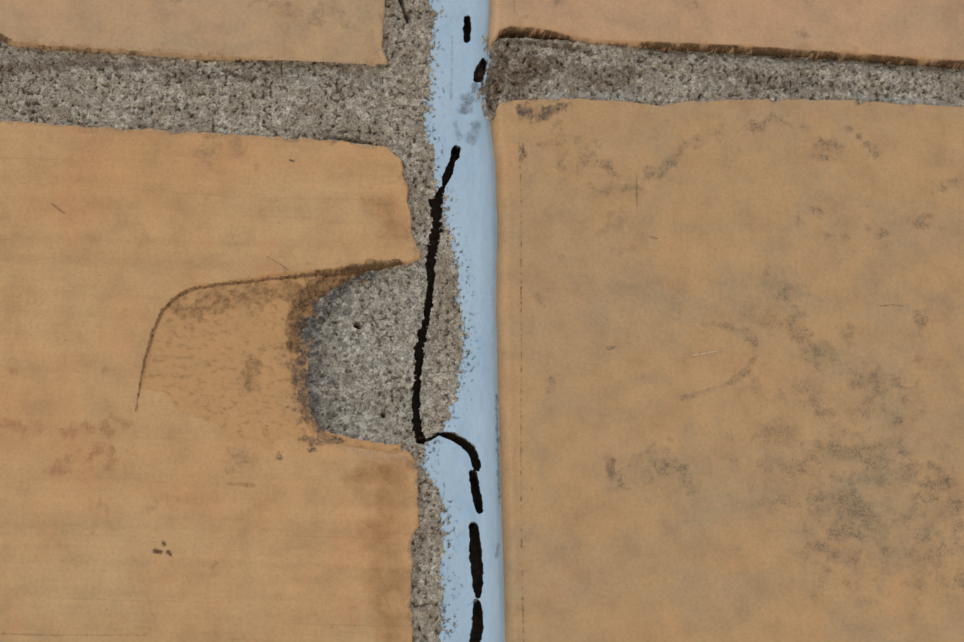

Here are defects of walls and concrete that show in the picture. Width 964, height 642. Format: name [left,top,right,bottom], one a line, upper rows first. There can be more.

spalling [138,242,439,459]
crack [411,146,484,642]